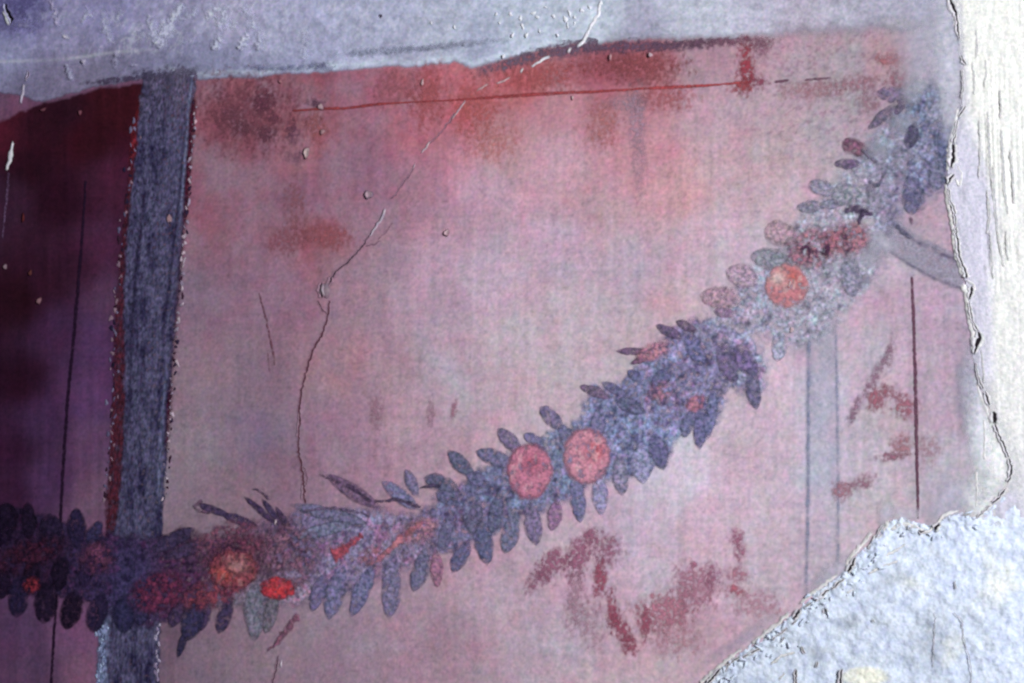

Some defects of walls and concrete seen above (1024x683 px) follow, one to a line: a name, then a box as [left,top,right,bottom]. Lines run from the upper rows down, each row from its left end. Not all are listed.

peeling [2,142,14,237]
crack [296,4,601,519]
spalling [705,0,1024,683]
crack [272,656,282,683]